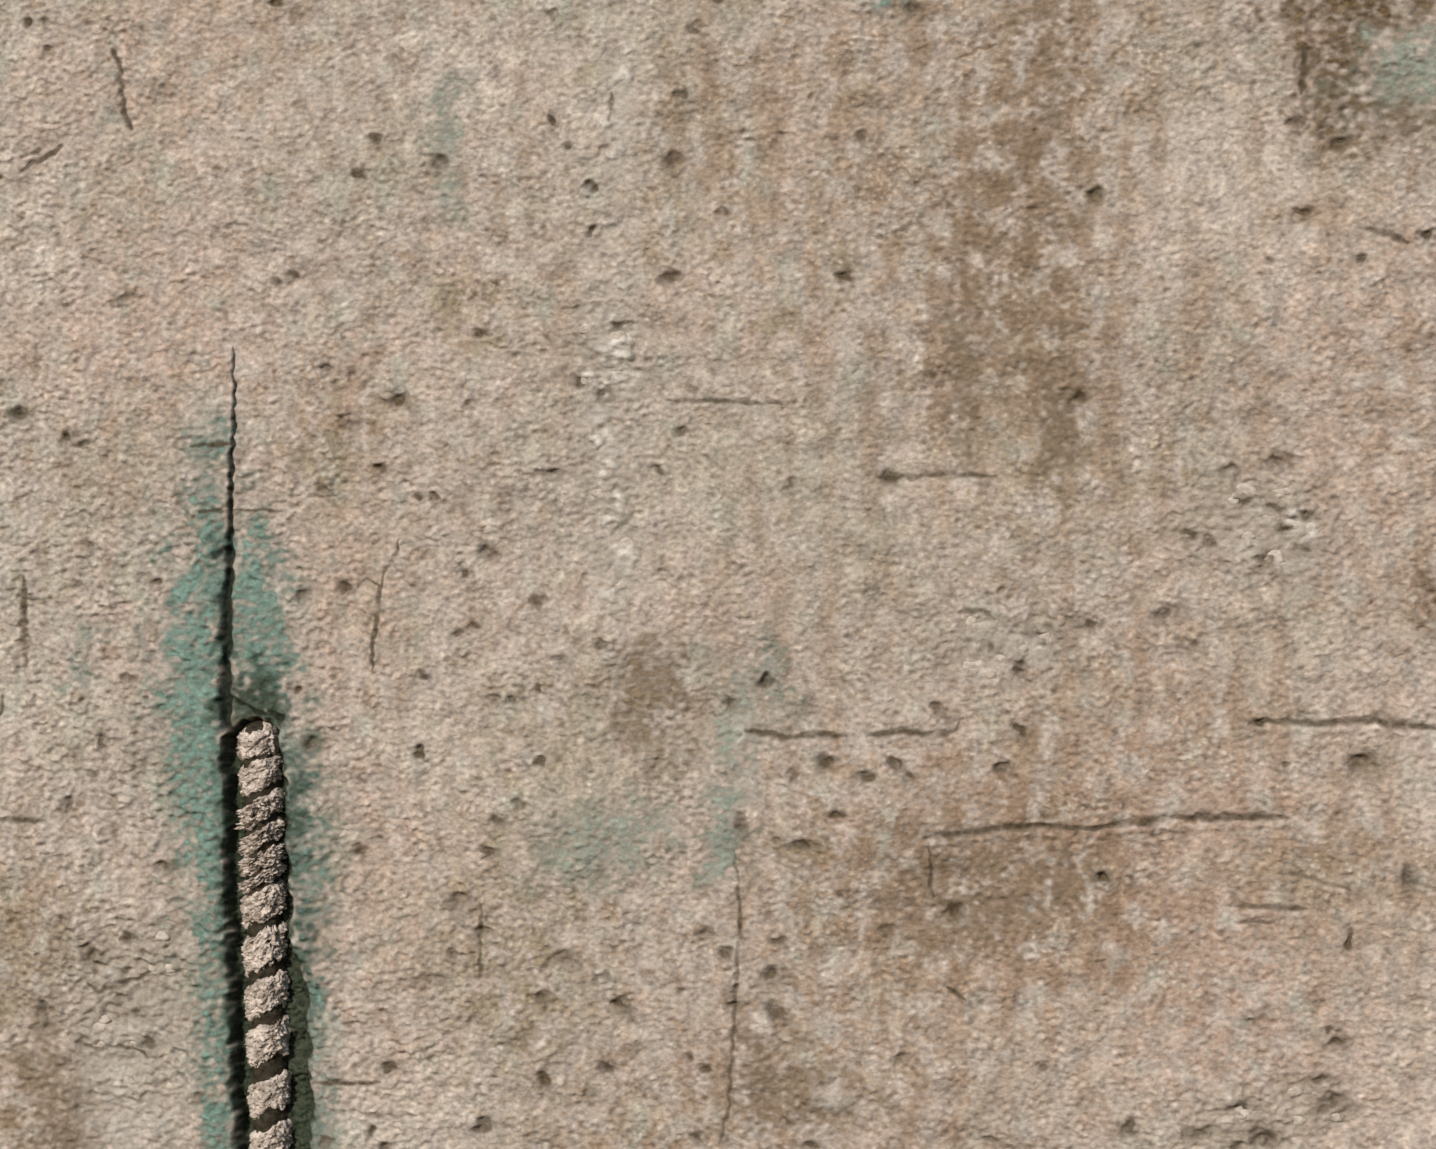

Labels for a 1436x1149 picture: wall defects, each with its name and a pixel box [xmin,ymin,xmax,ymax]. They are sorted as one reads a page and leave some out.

damp [1377,26,1436,108]
crack [191,348,285,727]
damp [140,475,326,1149]
spalling [221,719,327,1149]
damp [294,900,339,1149]
crack [924,814,1270,894]
crack [1250,717,1436,729]